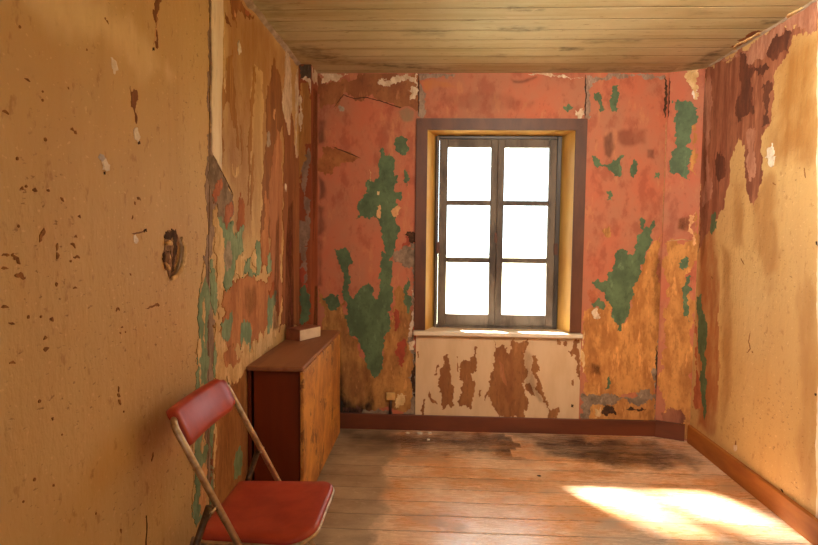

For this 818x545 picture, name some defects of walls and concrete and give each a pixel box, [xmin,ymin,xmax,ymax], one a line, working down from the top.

peeling [584,1,818,253]
hole [162,229,188,280]
peeling [194,0,272,391]
peeling [267,291,276,334]
peeling [294,67,560,418]
peeling [557,331,585,386]
peeling [587,217,663,331]
flaking render [571,341,686,424]
peeling [678,256,708,420]
peeling [190,423,217,545]
peeling [331,429,722,480]